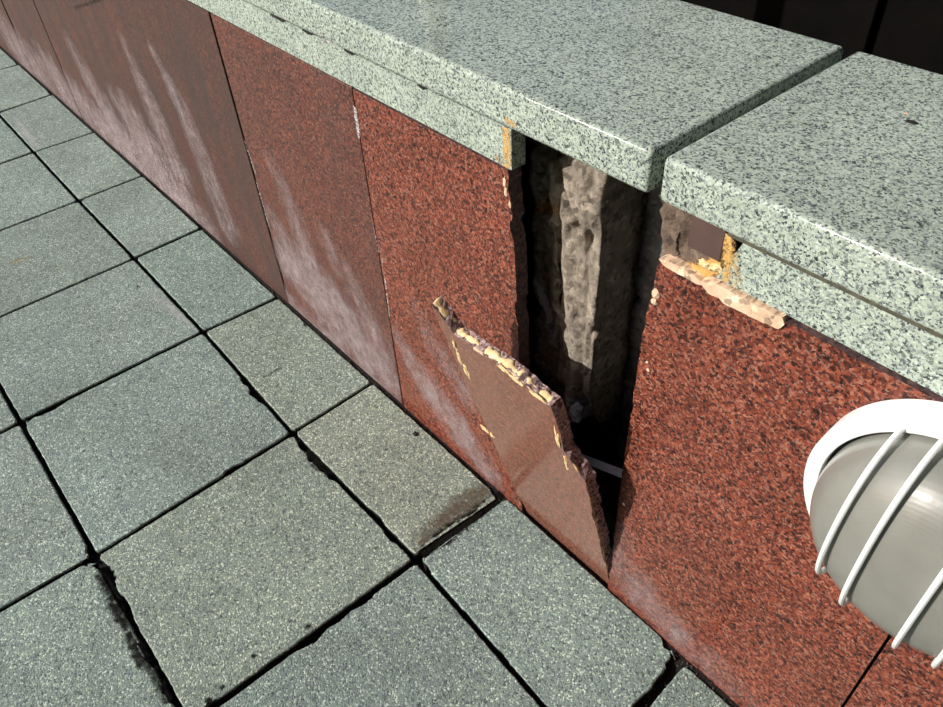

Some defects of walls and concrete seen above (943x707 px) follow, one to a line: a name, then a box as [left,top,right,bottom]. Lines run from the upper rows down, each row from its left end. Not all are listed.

damp [73,93,198,222]
damp [282,253,388,383]
spalling [529,139,791,545]